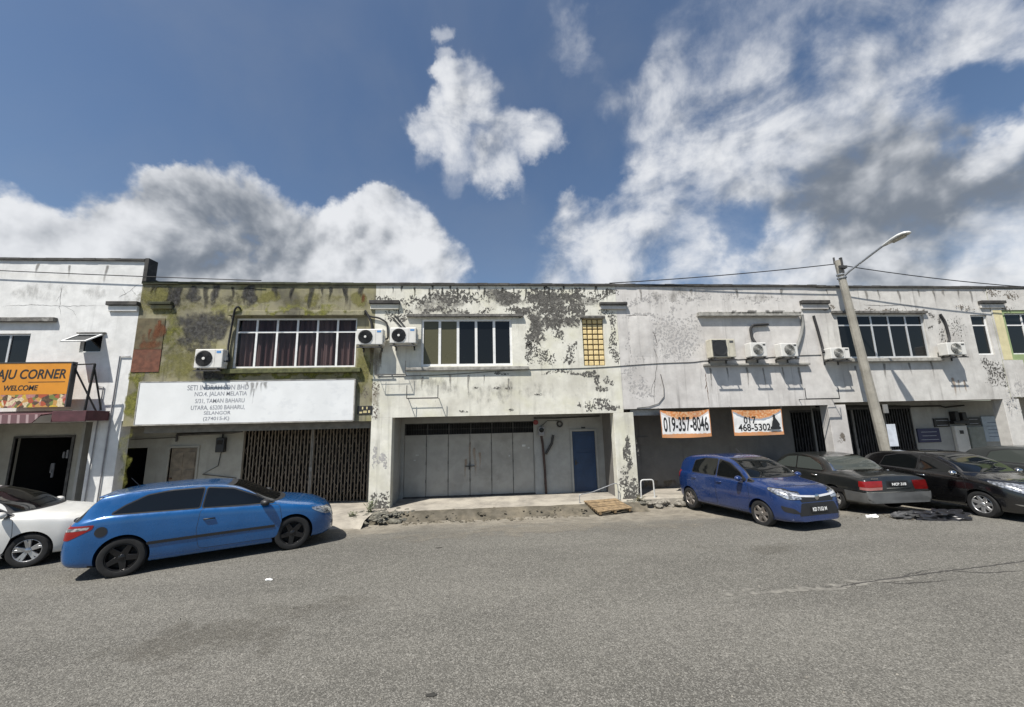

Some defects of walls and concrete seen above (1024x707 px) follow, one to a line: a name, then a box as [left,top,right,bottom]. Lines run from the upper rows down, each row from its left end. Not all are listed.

damp [142,284,257,351]
damp [308,287,364,308]
peeling [375,286,781,412]
peeling [982,358,1024,414]
spalling [619,435,641,499]